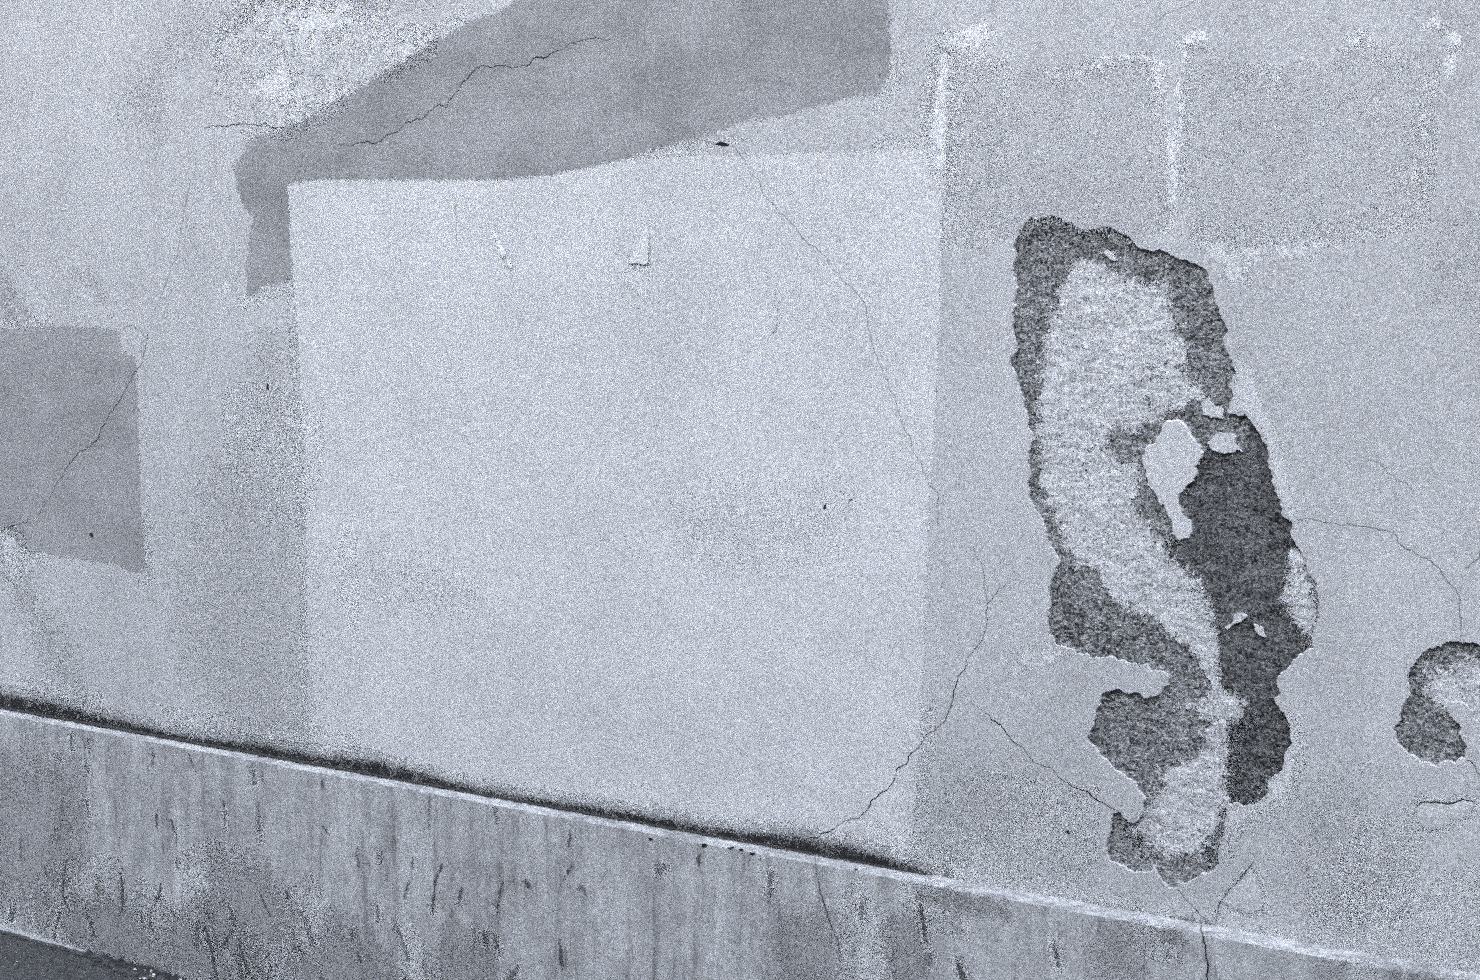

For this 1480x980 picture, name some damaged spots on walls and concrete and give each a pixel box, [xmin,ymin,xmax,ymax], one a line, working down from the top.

crack [331,37,610,146]
crack [0,122,290,533]
crack [672,114,941,527]
spalling [995,27,1324,889]
crack [808,547,1006,839]
crack [986,713,1118,812]
spalling [1393,641,1480,767]
crack [816,873,839,951]